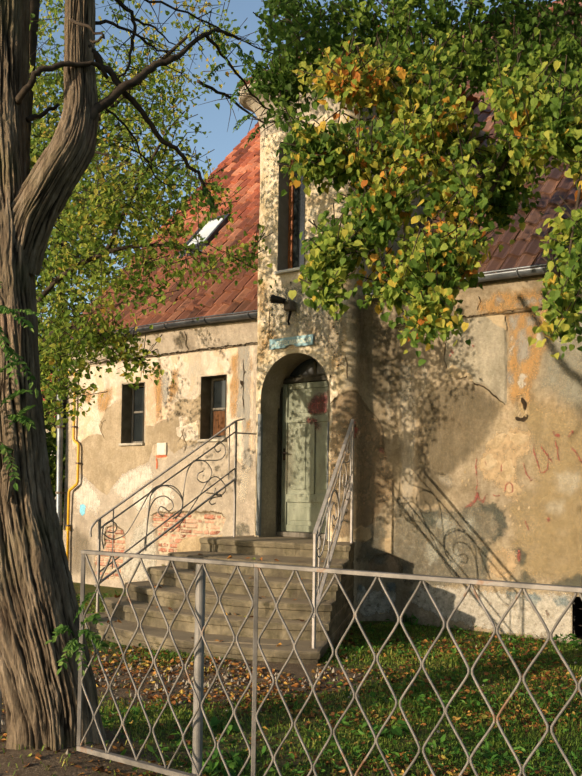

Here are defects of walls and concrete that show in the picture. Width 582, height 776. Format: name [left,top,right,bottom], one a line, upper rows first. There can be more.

spalling [93,524,126,580]
flaking render [72,345,255,495]
crack [93,310,270,408]
spalling [151,510,226,555]
water stain [356,388,508,588]
flaking render [444,314,532,527]
water stain [512,404,582,587]